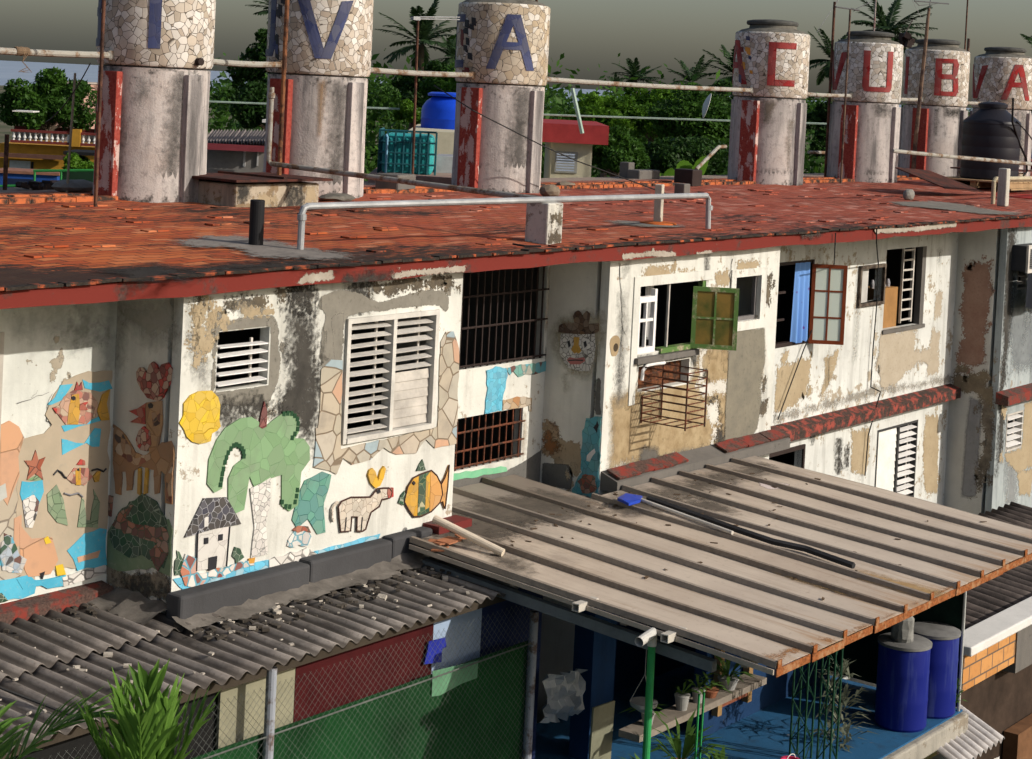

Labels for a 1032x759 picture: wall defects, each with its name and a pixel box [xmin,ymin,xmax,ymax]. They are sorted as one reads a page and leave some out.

peeling [102,74,110,123]
peeling [460,89,474,187]
peeling [184,287,293,370]
leakage [101,260,393,298]
leakage [217,284,326,449]
peeling [366,267,461,309]
flaking render [541,419,597,494]
peeling [609,349,729,469]
peeling [759,345,842,418]
peeling [873,290,943,394]
peeling [922,406,941,495]
peeling [951,254,1032,499]